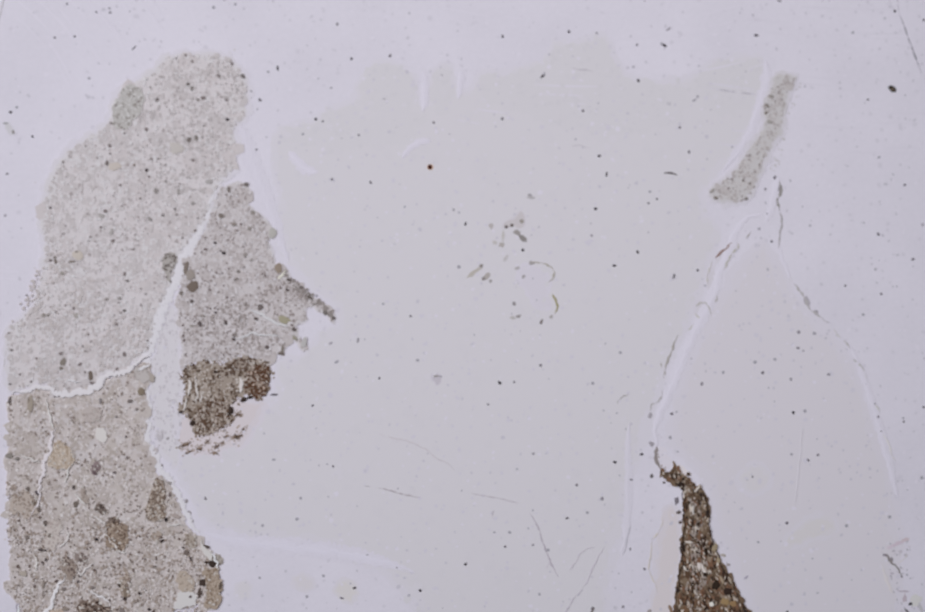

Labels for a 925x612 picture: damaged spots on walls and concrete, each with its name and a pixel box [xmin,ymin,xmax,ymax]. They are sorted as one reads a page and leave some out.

crack [12,179,226,533]
peeling [176,410,247,457]
crack [43,578,65,612]